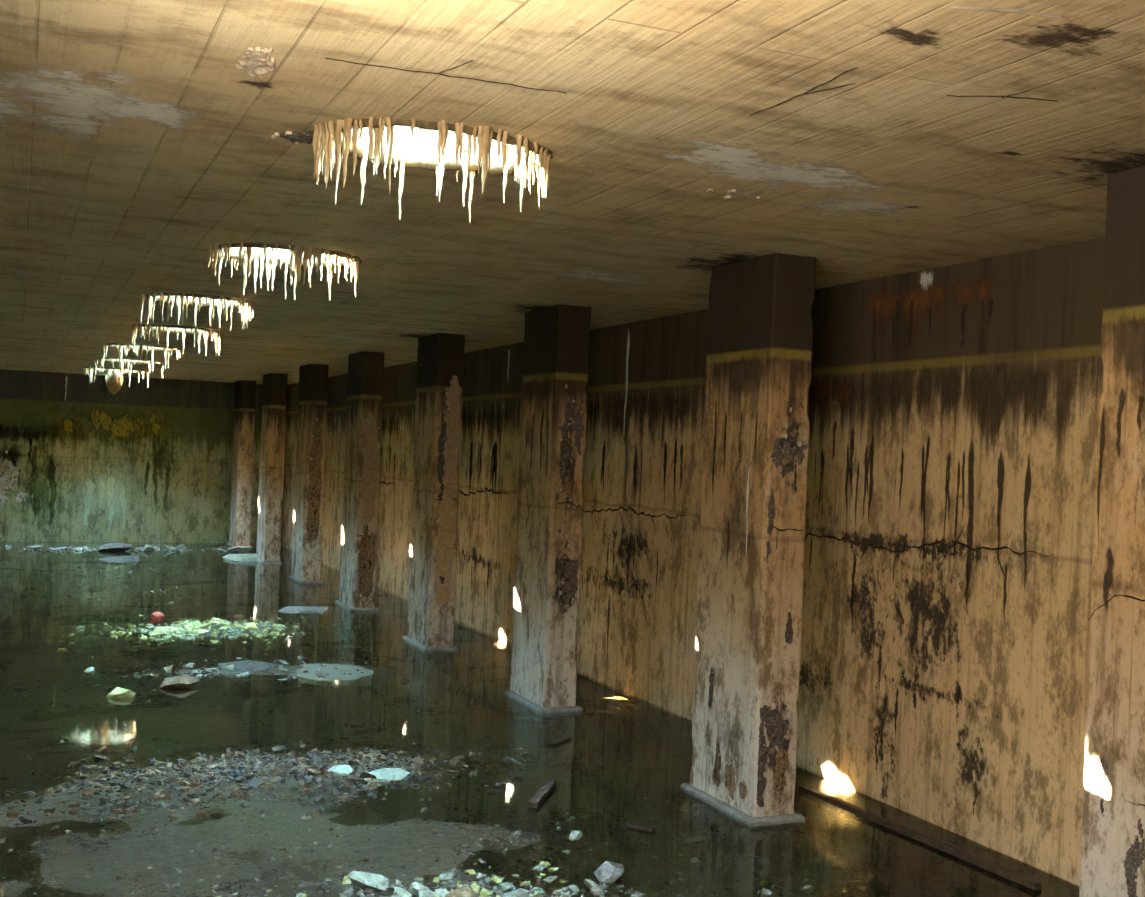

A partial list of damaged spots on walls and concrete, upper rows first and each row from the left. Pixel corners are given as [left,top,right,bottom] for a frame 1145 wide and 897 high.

spalling [0,450,33,506]
damp [0,424,46,488]
damp [70,462,135,529]
crack [554,501,685,540]
spalling [766,489,776,562]
spalling [770,396,808,478]
crack [768,525,1049,581]
damp [1097,315,1145,609]
damp [805,364,1048,813]
crack [1089,595,1145,620]
damp [799,661,832,695]
spalling [712,703,792,807]